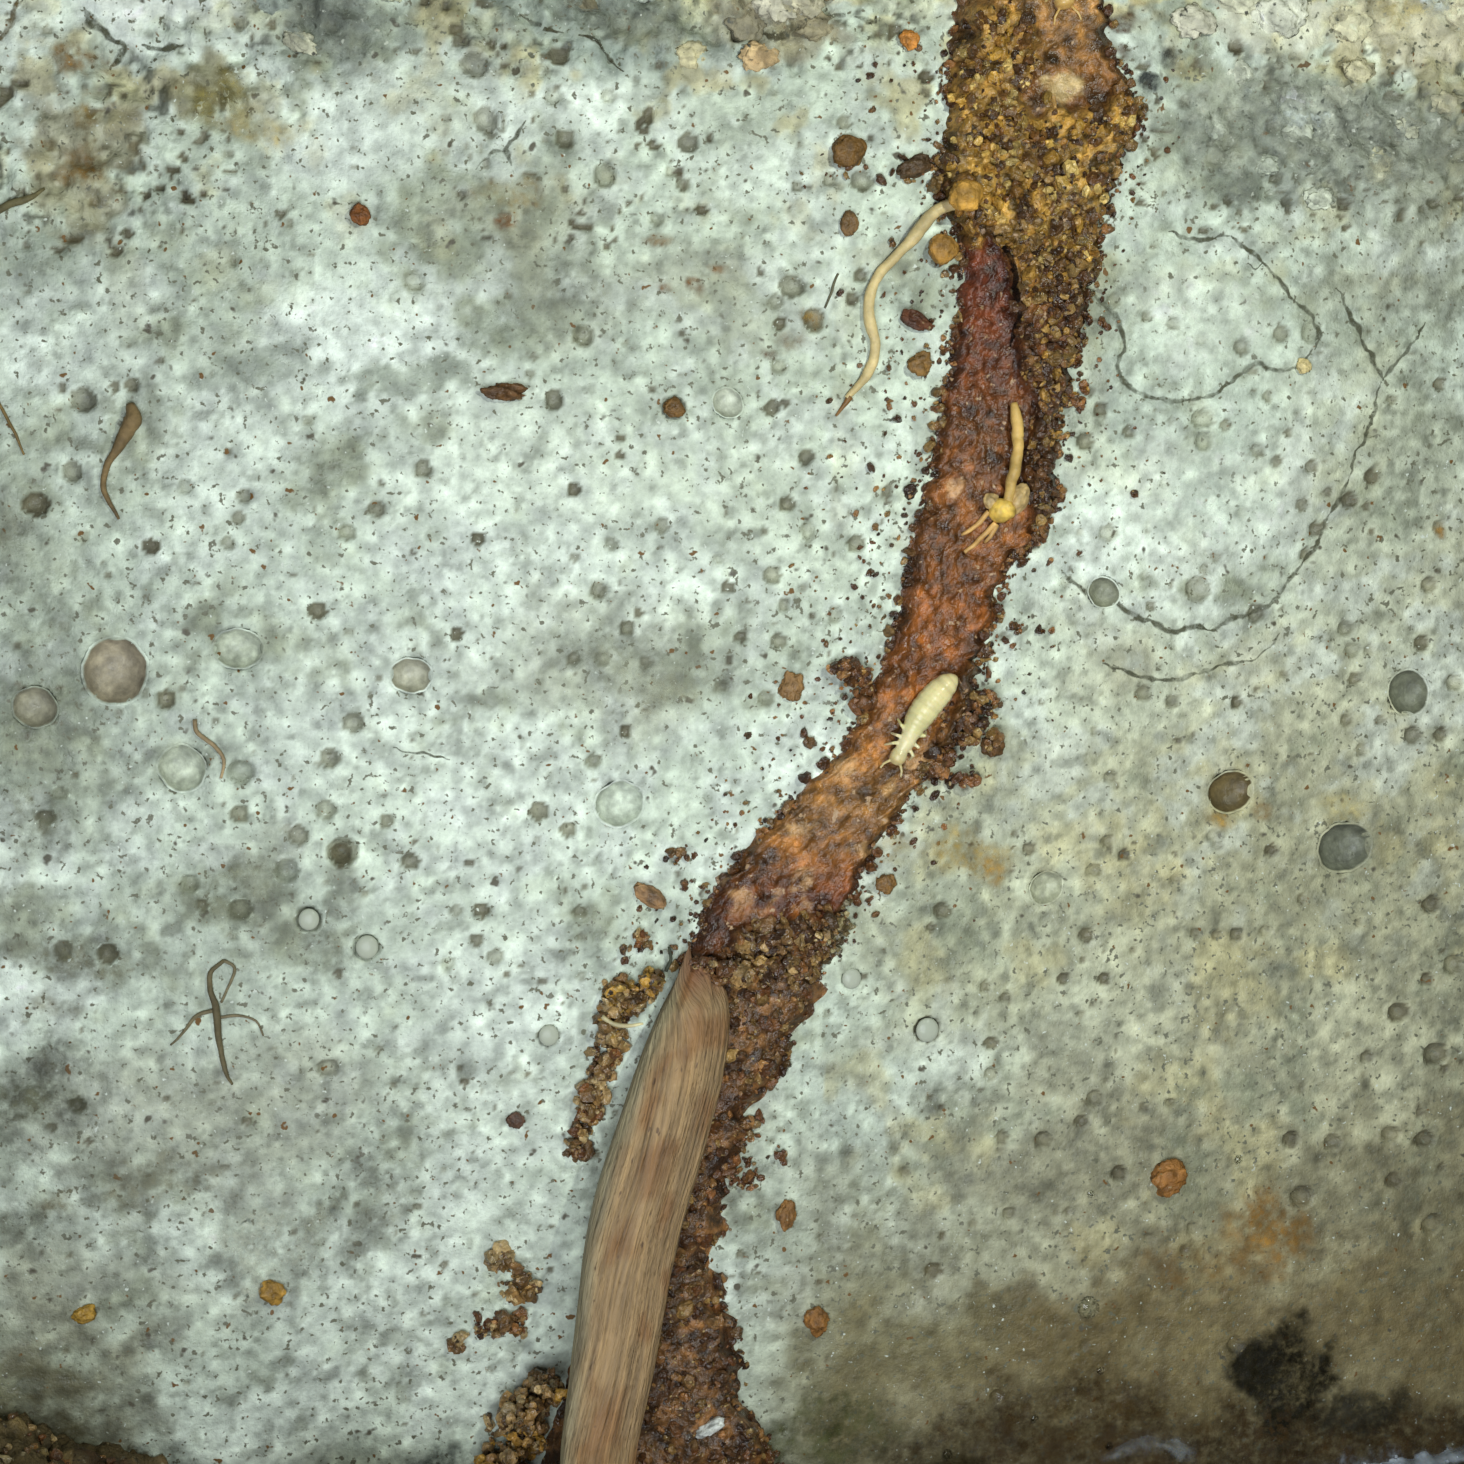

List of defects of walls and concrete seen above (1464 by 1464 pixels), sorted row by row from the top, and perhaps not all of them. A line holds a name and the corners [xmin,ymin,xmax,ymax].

crack [1098,230,1426,682]
damp [769,1396,922,1462]
damp [935,1309,1464,1464]